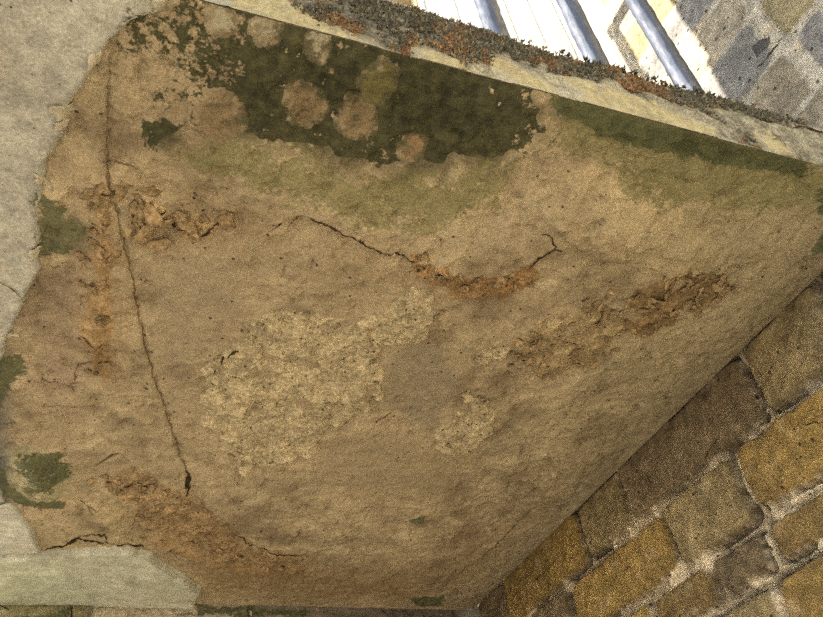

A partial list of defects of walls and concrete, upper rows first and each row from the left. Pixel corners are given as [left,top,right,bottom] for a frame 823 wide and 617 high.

leakage [102,0,573,169]
crack [736,111,820,145]
flaking render [0,0,168,360]
crack [98,77,188,475]
flaking render [73,180,237,264]
crack [271,216,409,261]
spalling [409,253,545,304]
crack [529,234,562,269]
spalling [507,271,738,385]
leakage [0,351,31,425]
leakage [0,447,69,510]
flaking render [0,467,306,609]